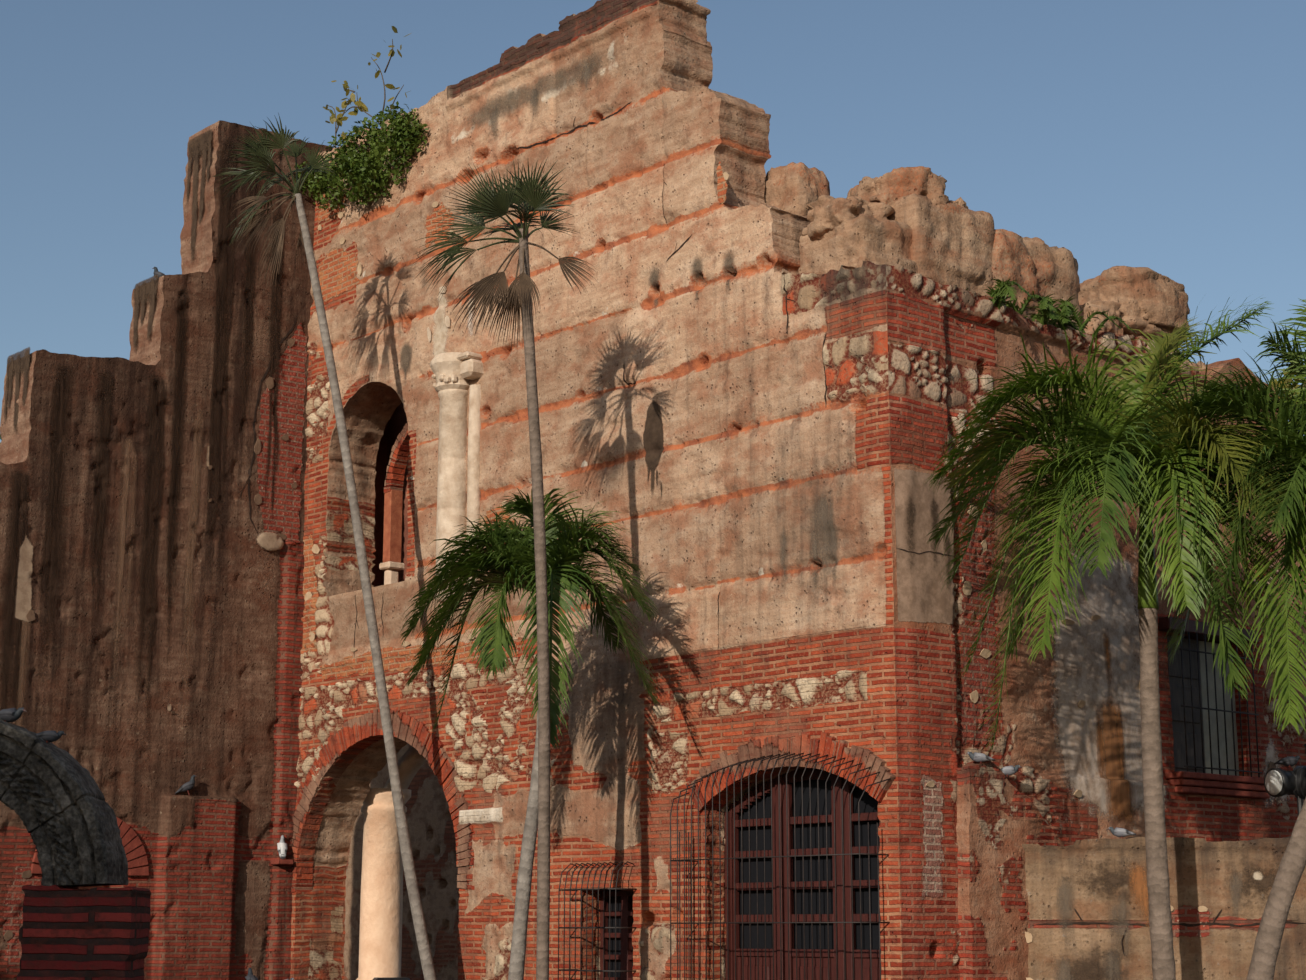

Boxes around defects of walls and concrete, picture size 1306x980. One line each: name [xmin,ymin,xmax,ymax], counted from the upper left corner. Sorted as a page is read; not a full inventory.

leakage [4,347,30,430]
leakage [133,275,158,351]
leakage [187,129,260,526]
leakage [267,214,284,508]
leakage [92,372,113,580]
leakage [139,289,188,692]
leakage [643,401,664,495]
leakage [907,498,951,576]
peeling [1053,546,1144,816]
leakage [1058,866,1134,980]
leakage [1230,864,1276,907]